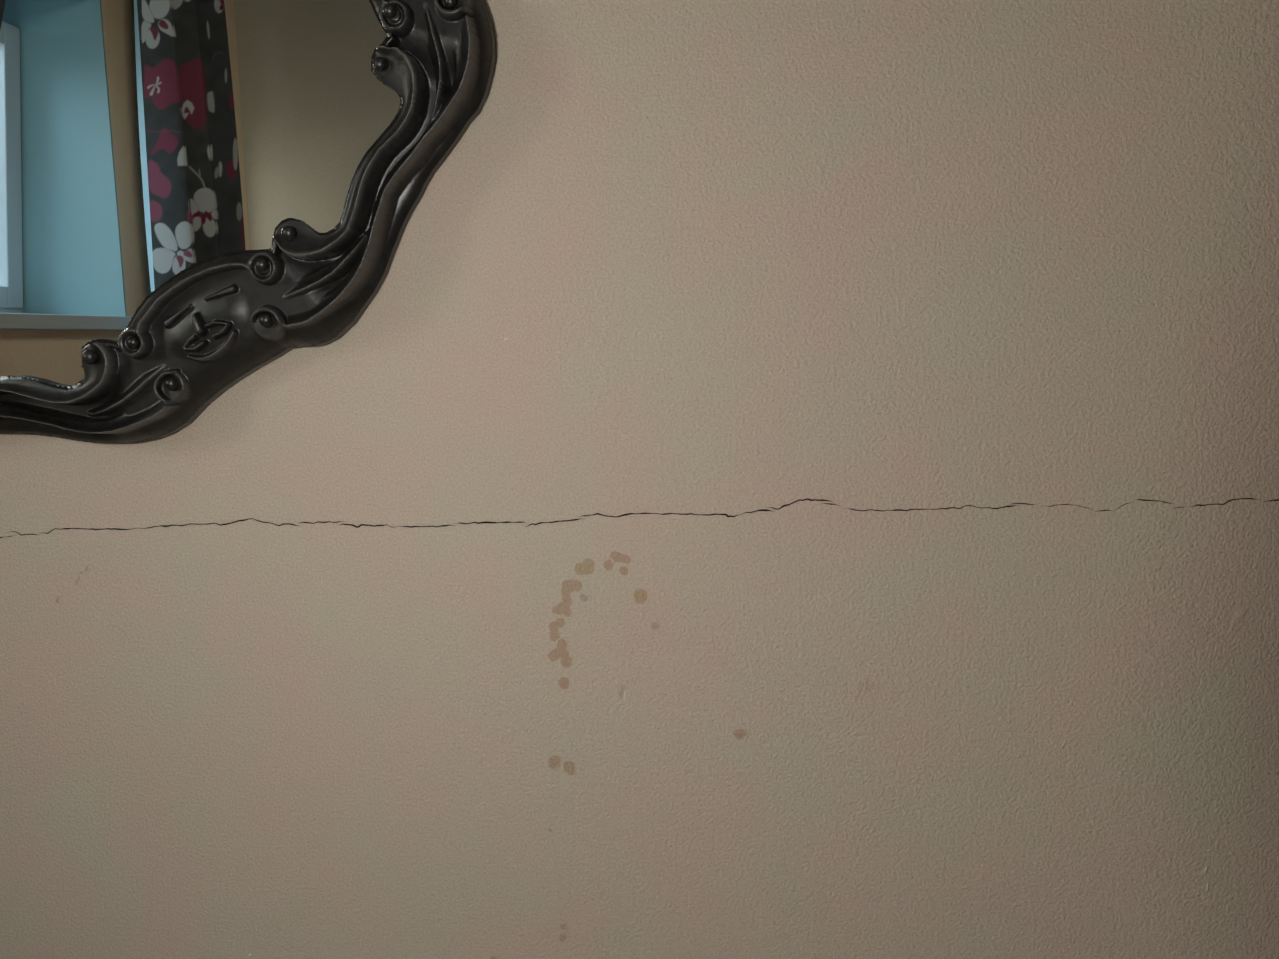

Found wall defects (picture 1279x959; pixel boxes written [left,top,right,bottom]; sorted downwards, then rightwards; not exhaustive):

crack [0,498,1279,538]
water stain [546,550,649,691]